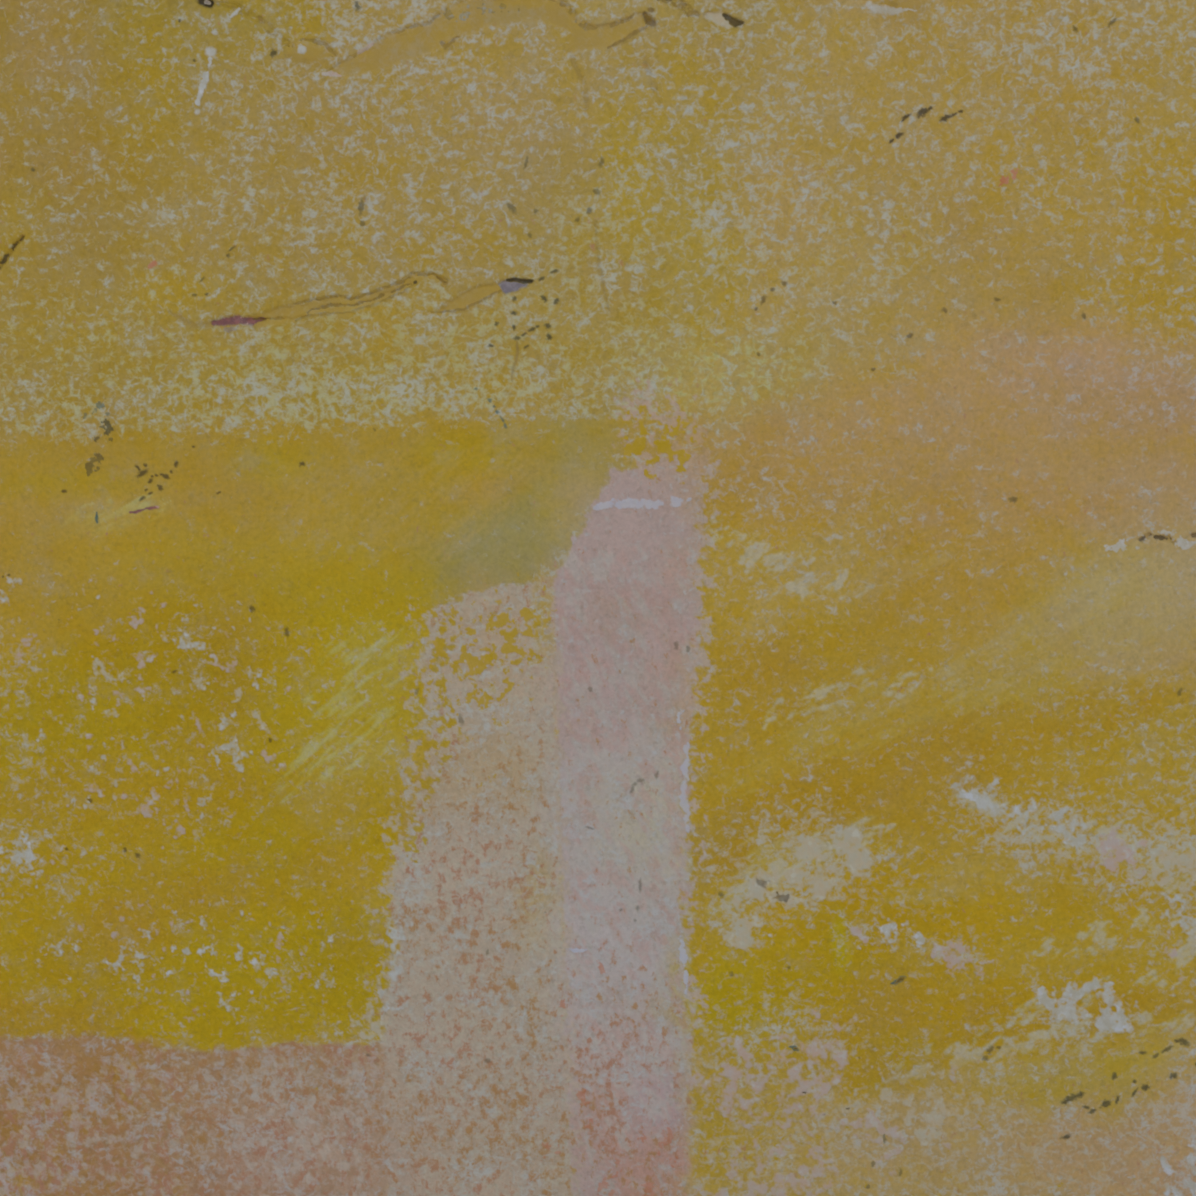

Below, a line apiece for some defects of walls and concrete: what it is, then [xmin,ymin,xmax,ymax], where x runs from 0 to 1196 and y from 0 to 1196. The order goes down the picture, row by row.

crack [196,0,746,111]
crack [167,271,448,334]
peeling [622,404,698,485]
crack [1100,521,1196,557]
peeling [417,598,553,714]
peeling [35,589,292,850]
peeling [713,824,888,951]
peeling [946,771,1196,966]
peeling [100,899,338,1035]
peeling [846,910,996,982]
peeling [1034,975,1139,1036]
peeling [667,1004,998,1196]